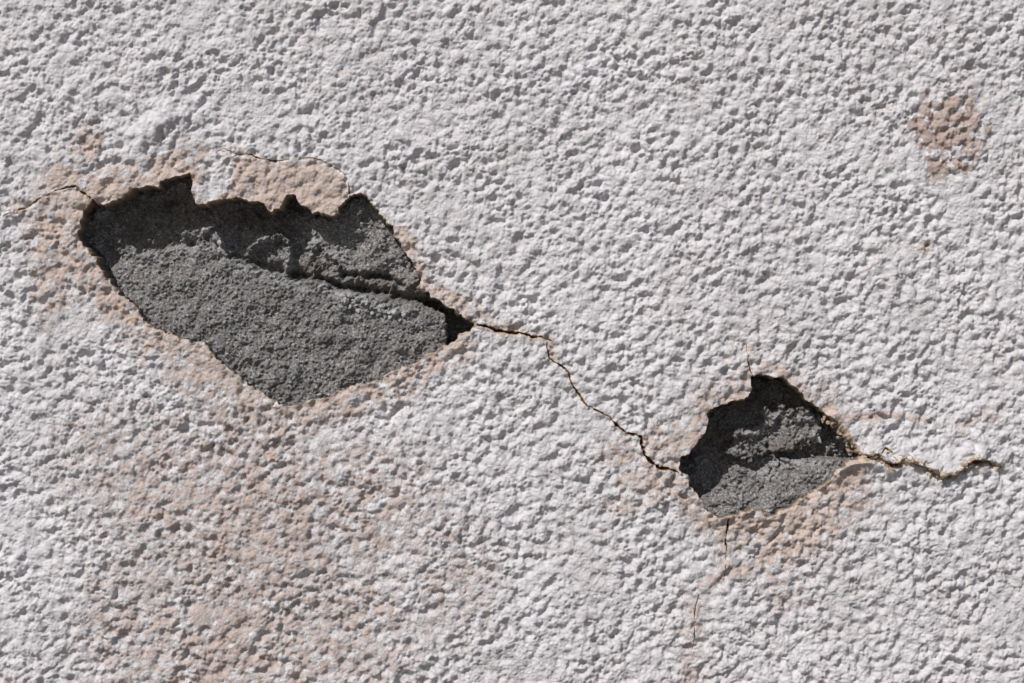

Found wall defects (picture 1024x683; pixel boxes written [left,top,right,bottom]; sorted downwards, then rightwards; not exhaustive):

spalling [76,157,476,408]
crack [476,320,679,474]
spalling [677,373,864,519]
crack [858,446,1004,483]